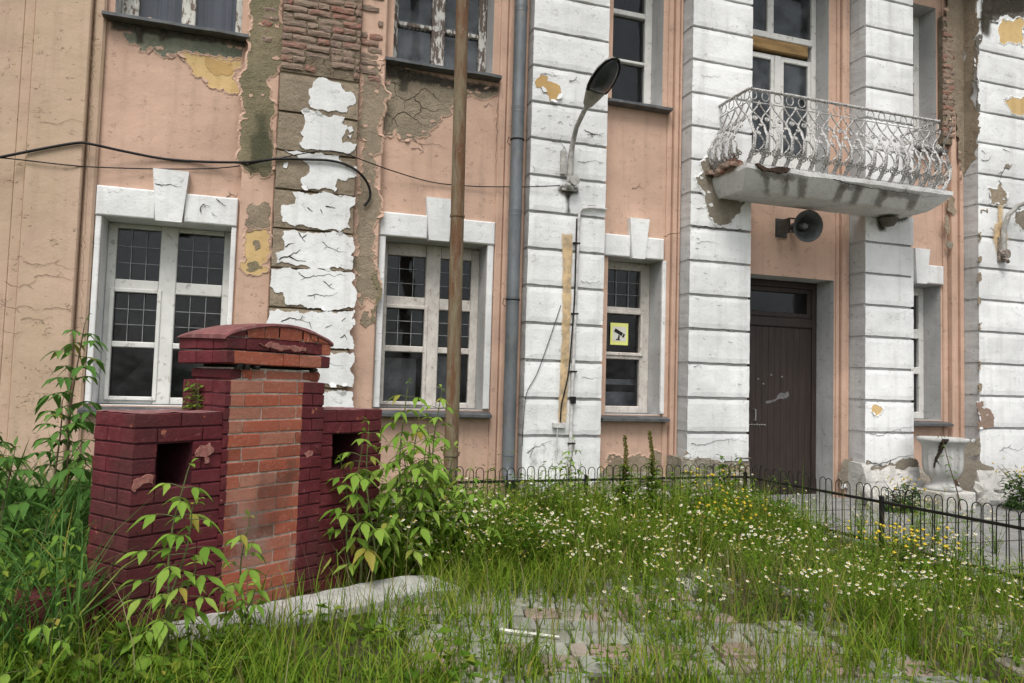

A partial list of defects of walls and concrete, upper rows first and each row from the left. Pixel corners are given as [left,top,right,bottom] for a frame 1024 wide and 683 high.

leakage [112,21,245,47]
crack [388,80,444,153]
flaking render [467,83,499,102]
peeling [535,73,574,124]
flaking render [938,0,1024,179]
flaking render [121,0,454,407]
flaking render [694,155,791,228]
flaking render [981,164,1024,232]
peeling [131,474,154,492]
peeling [195,443,214,463]
flaking render [866,456,920,473]
flaking render [956,383,995,491]